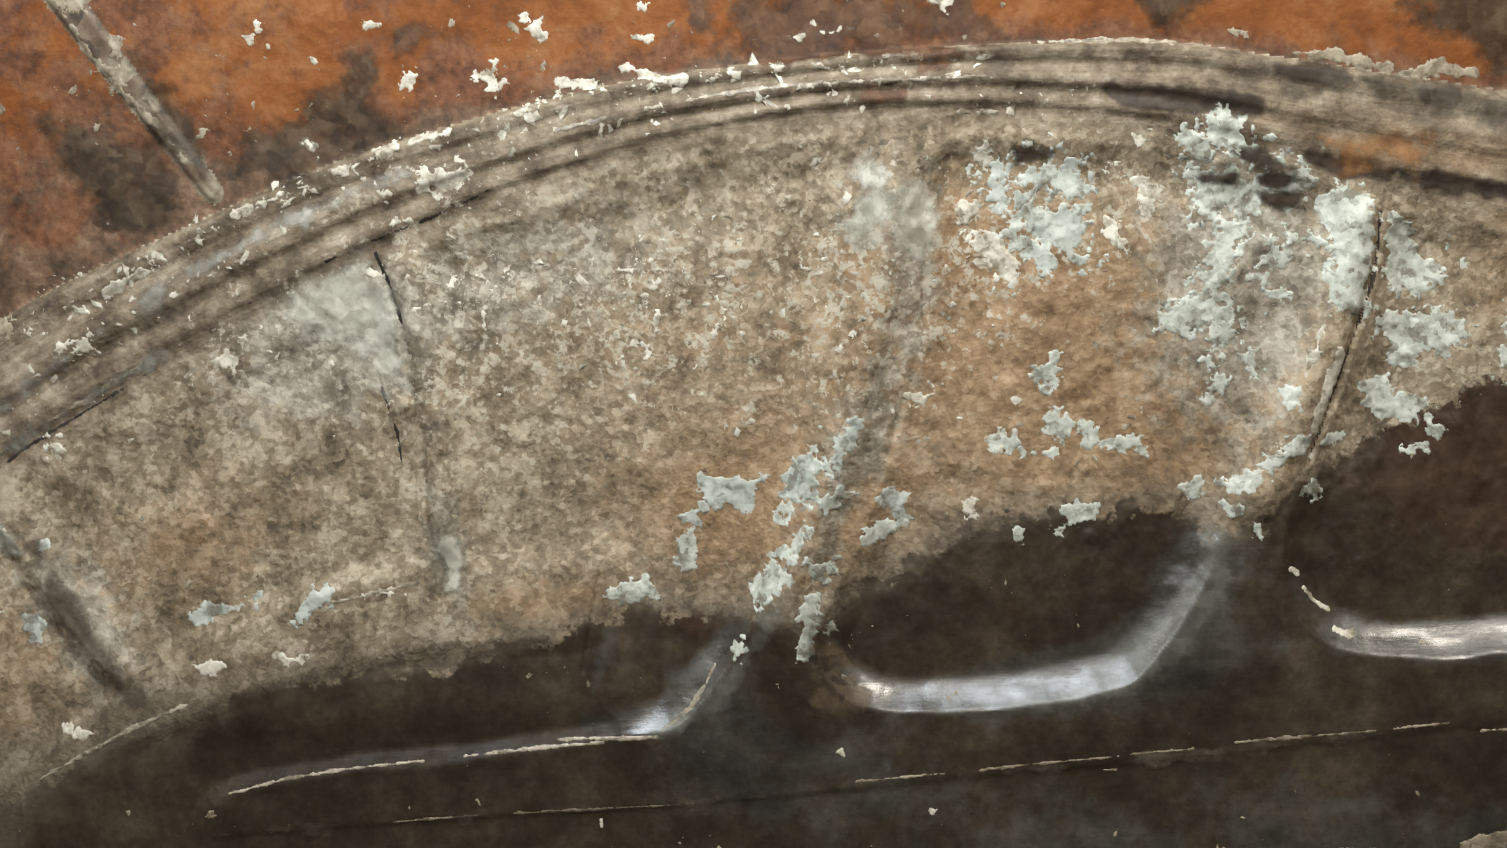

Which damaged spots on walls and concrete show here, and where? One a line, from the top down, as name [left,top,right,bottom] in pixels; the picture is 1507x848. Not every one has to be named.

rust [752,40,983,74]
rust [1102,82,1264,116]
rust [1013,147,1053,161]
rust [1198,132,1507,210]
water stain [845,163,937,270]
crack [371,190,489,324]
crack [1308,211,1382,462]
crack [379,375,403,465]
water stain [1289,567,1355,639]
water stain [228,760,425,794]
water stain [463,663,716,758]
water stain [978,722,1449,772]